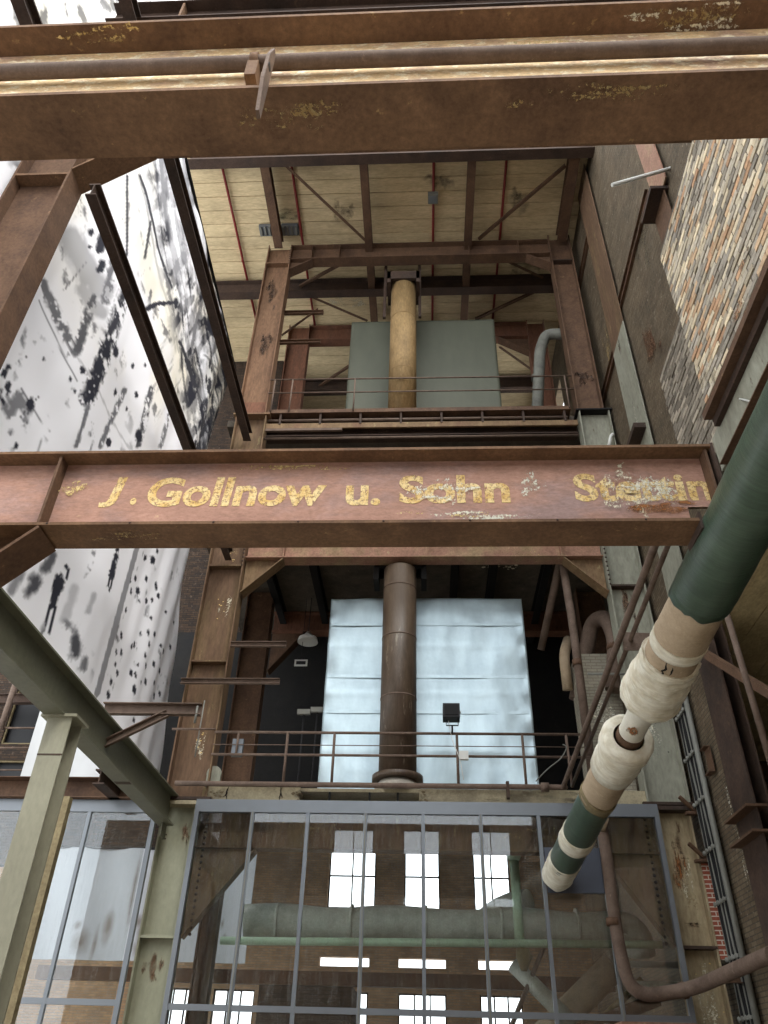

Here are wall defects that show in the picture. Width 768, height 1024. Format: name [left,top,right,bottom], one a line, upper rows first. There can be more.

peeling [624,1,749,32]
peeling [602,462,683,517]